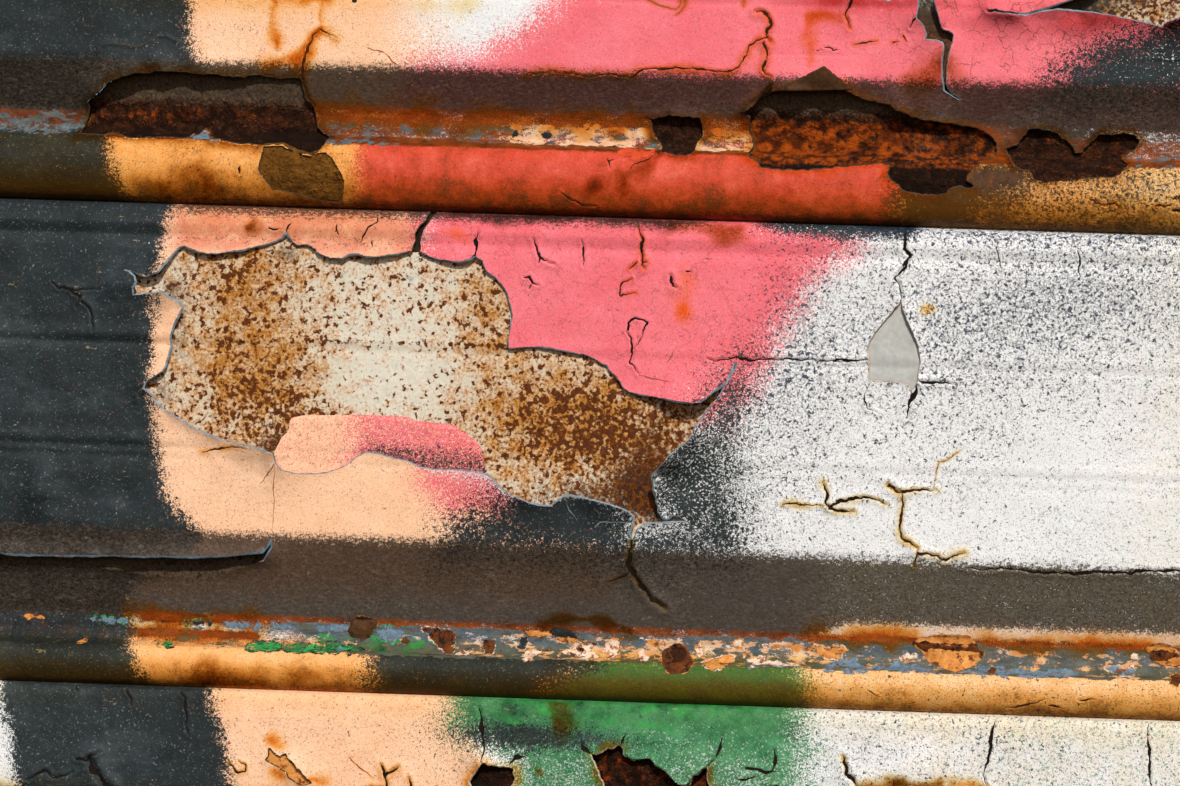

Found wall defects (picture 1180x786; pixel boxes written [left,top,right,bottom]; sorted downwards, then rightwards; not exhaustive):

spalling [0,66,413,203]
spalling [738,66,1148,196]
crack [619,227,711,382]
crack [894,227,912,302]
peeling [124,212,738,540]
crack [785,452,1180,576]
rust [401,626,457,655]
rust [660,643,697,674]
rust [853,632,984,654]
rust [1129,642,1180,661]
spalling [469,762,516,786]
crack [983,698,1094,785]